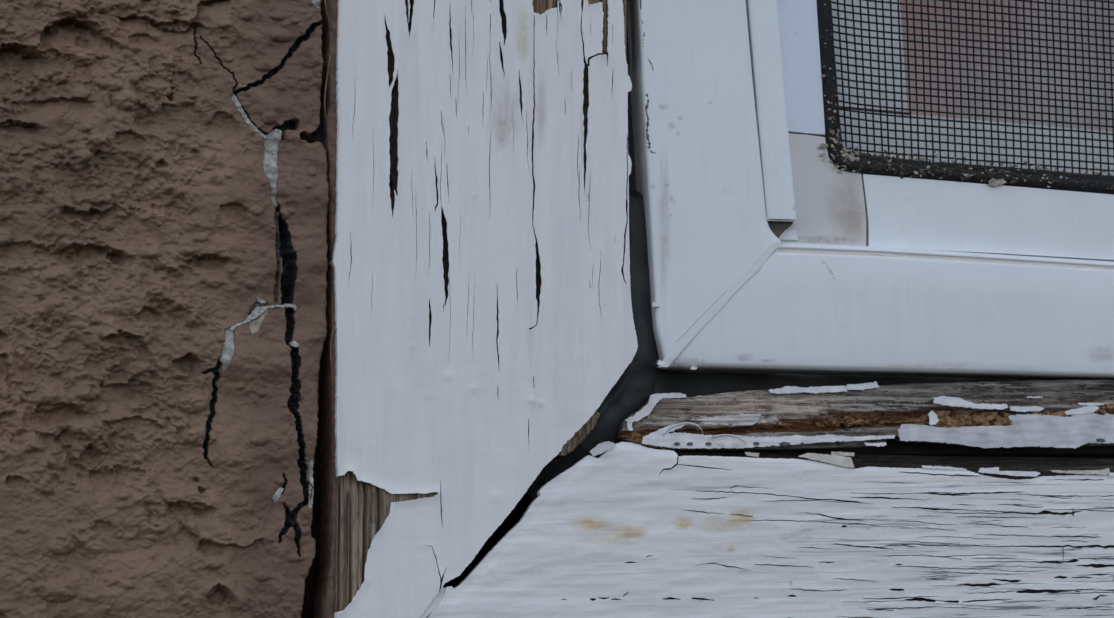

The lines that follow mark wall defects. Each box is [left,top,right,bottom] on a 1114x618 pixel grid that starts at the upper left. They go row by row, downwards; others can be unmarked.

peeling [532,0,562,15]
peeling [588,0,608,53]
crack [373,0,613,393]
crack [589,0,656,311]
crack [193,21,324,556]
peeling [769,381,879,394]
peeling [625,393,1114,468]
peeling [334,471,438,613]
crack [660,457,1114,618]